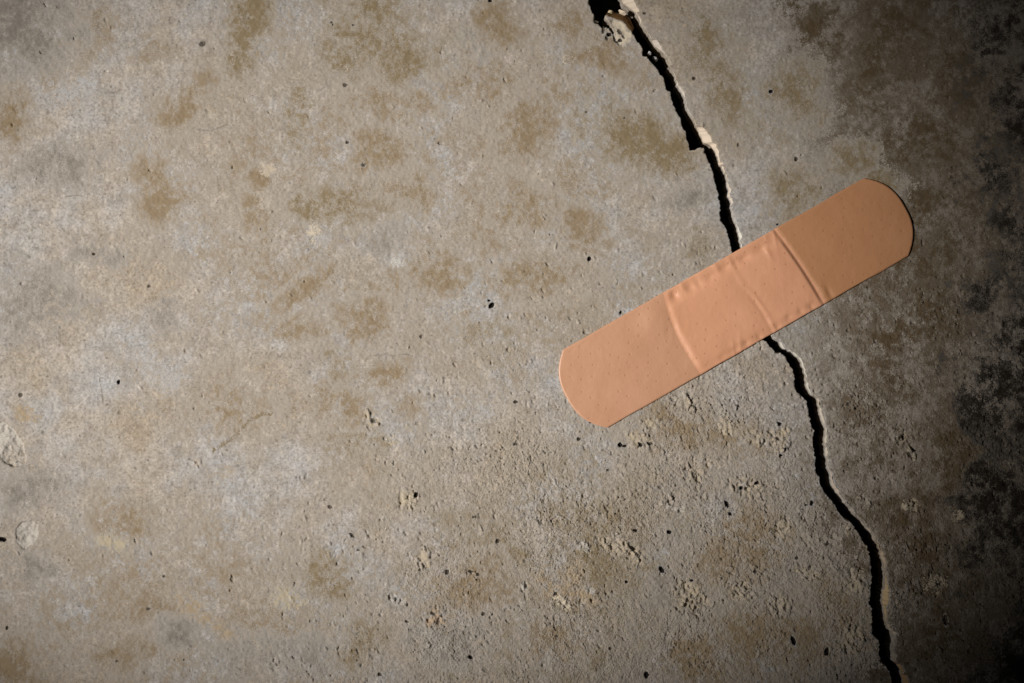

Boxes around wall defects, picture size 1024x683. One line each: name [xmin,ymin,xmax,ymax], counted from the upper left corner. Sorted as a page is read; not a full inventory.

crack [589,0,736,253]
crack [762,337,896,683]